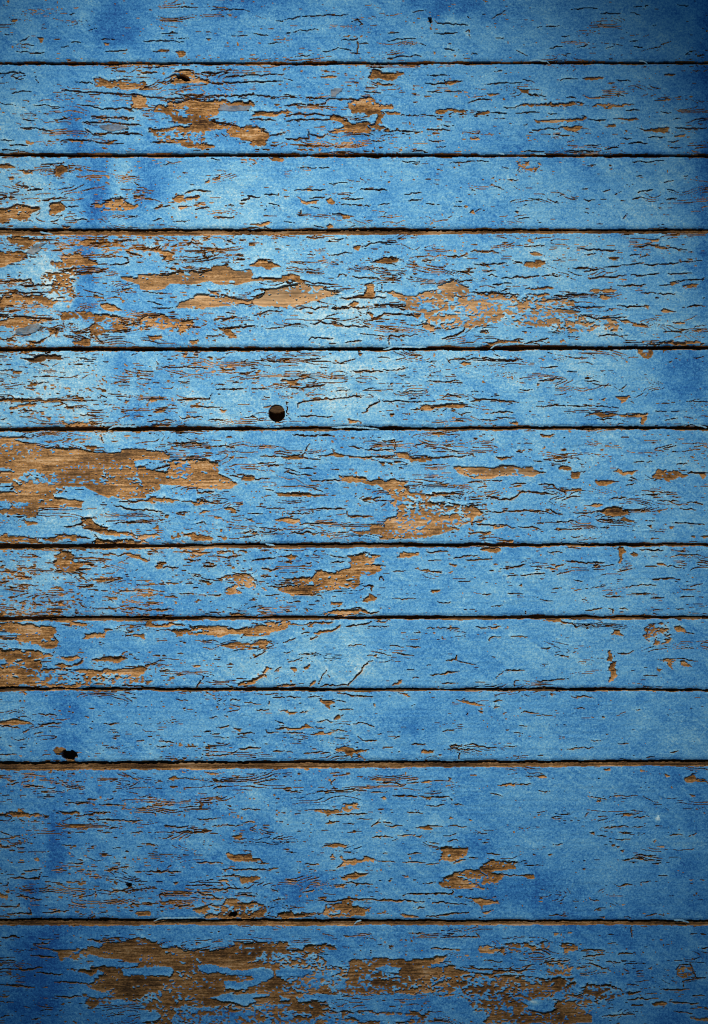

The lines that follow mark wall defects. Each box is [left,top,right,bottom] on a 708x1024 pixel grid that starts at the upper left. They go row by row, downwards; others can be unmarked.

peeling [91,49,292,164]
peeling [319,66,407,137]
peeling [0,201,708,376]
peeling [0,433,707,699]
peeling [437,843,537,916]
peeling [50,930,669,1024]